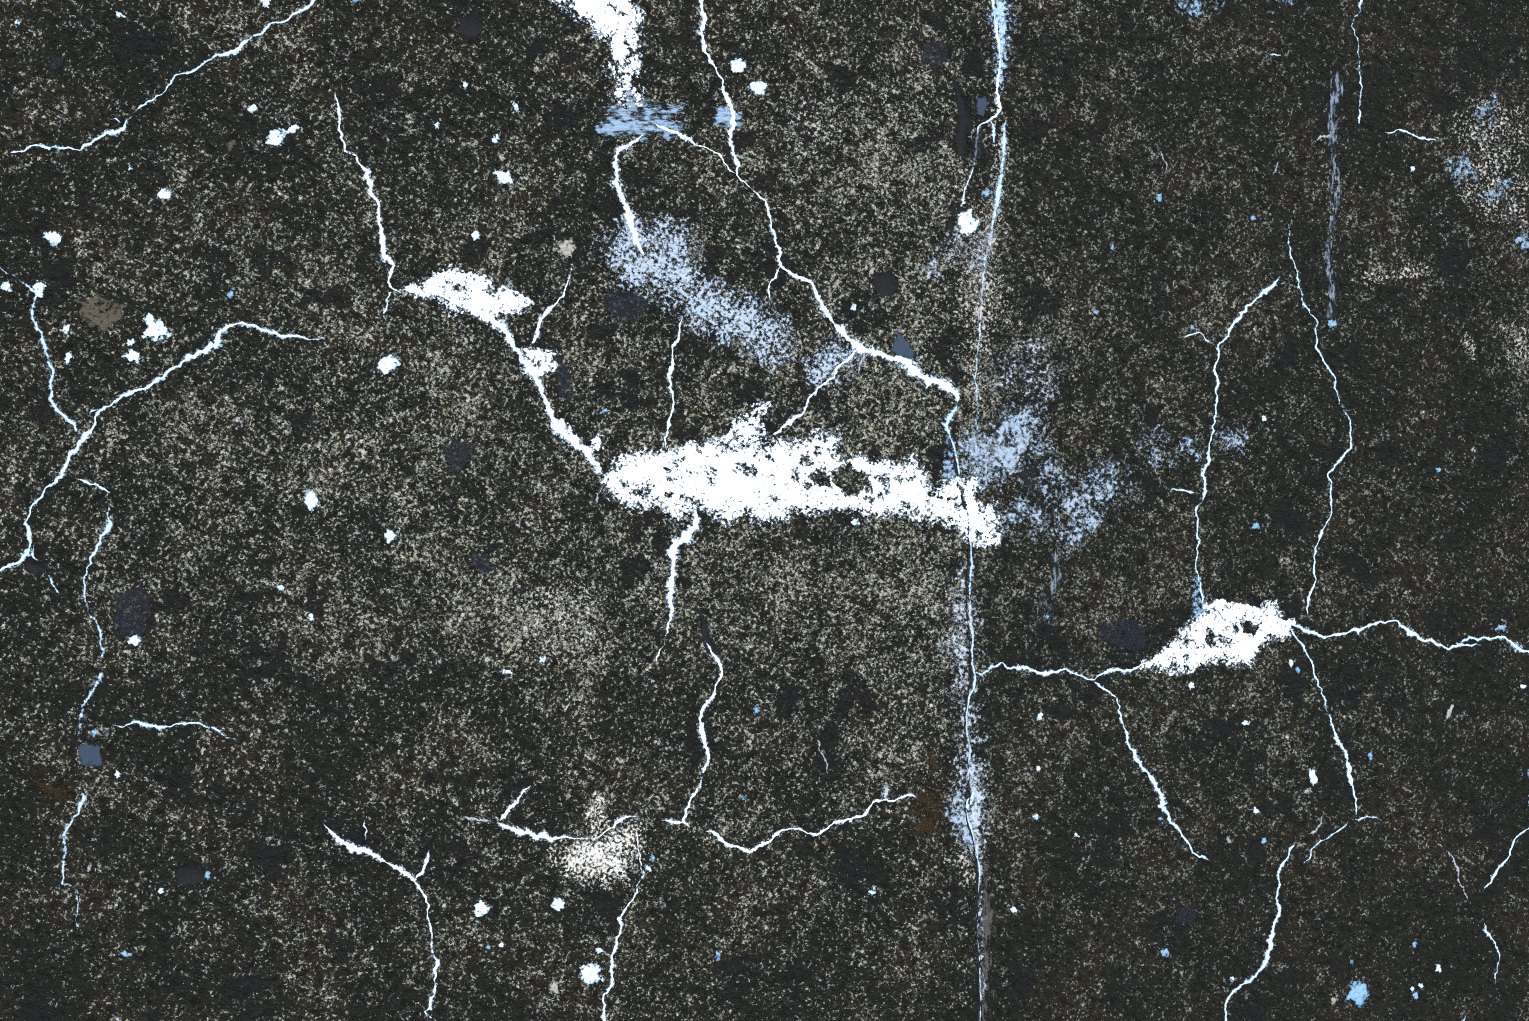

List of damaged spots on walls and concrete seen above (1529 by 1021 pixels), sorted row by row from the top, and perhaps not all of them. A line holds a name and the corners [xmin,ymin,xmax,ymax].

leakage [549,0,685,143]
crack [0,267,326,931]
leakage [400,264,534,323]
crack [467,264,605,503]
leakage [520,347,558,380]
leakage [550,338,1137,626]
crack [609,0,1208,1021]
leakage [1136,423,1249,467]
leakage [1139,569,1296,676]
crack [1171,225,1529,1021]
crack [324,822,440,1021]
crack [462,644,916,1021]